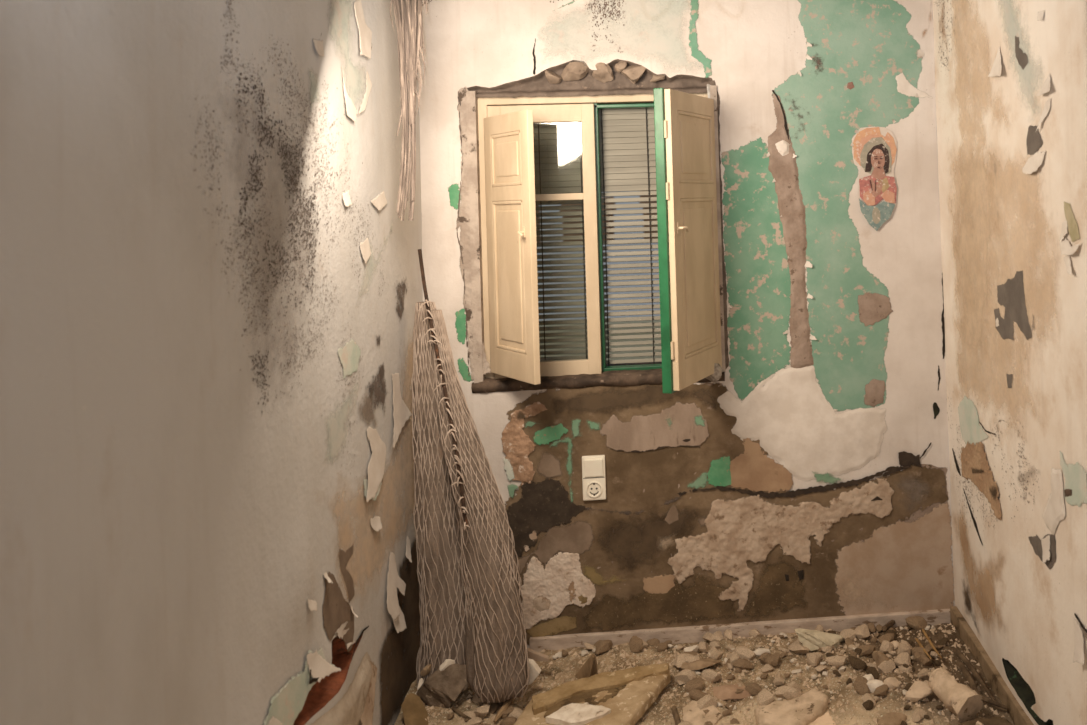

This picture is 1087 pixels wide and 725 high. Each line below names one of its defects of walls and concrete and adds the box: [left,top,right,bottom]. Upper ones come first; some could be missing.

leakage [550,0,625,53]
leakage [191,0,407,412]
peeling [448,0,933,411]
leakage [936,0,1054,517]
spalling [994,271,1034,341]
spalling [264,544,369,725]
peeling [518,514,596,646]
peeling [501,390,712,502]
leakage [505,383,996,645]
peeling [643,438,955,616]
crack [677,274,982,544]
spalling [1002,658,1053,725]